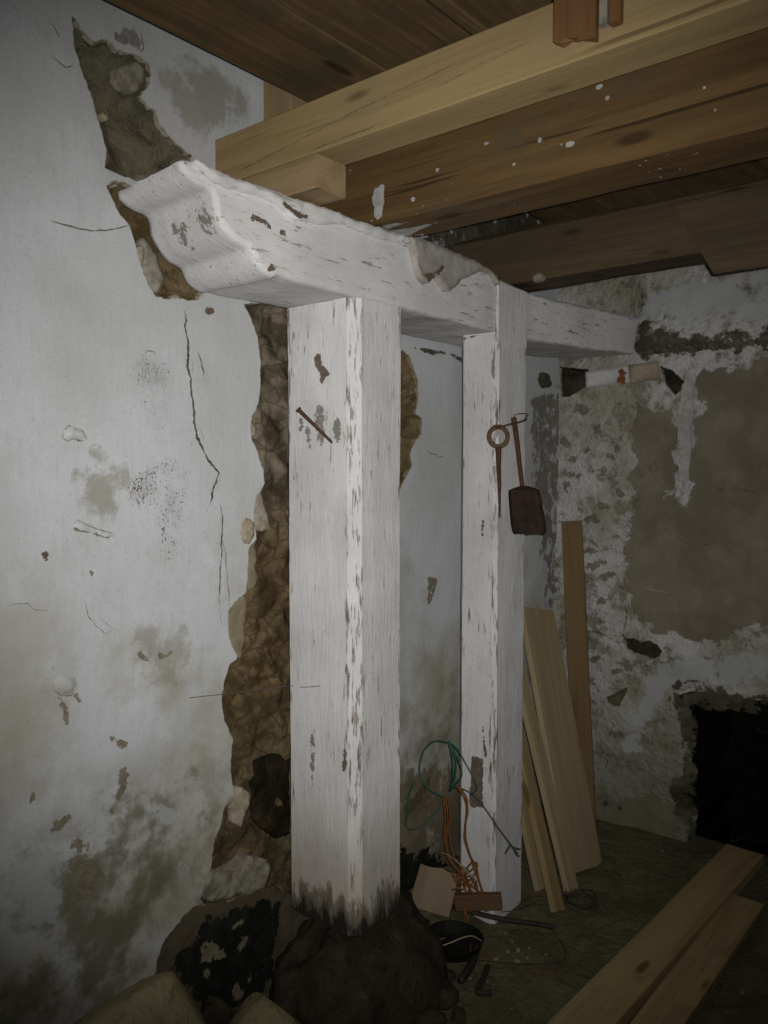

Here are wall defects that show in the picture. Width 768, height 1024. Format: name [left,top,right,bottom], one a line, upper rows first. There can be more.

crack [48,219,129,231]
spalling [72,16,500,315]
crack [184,311,230,619]
spalling [200,303,341,905]
spalling [399,350,422,490]
peeling [560,357,768,660]
leakage [47,799,165,987]